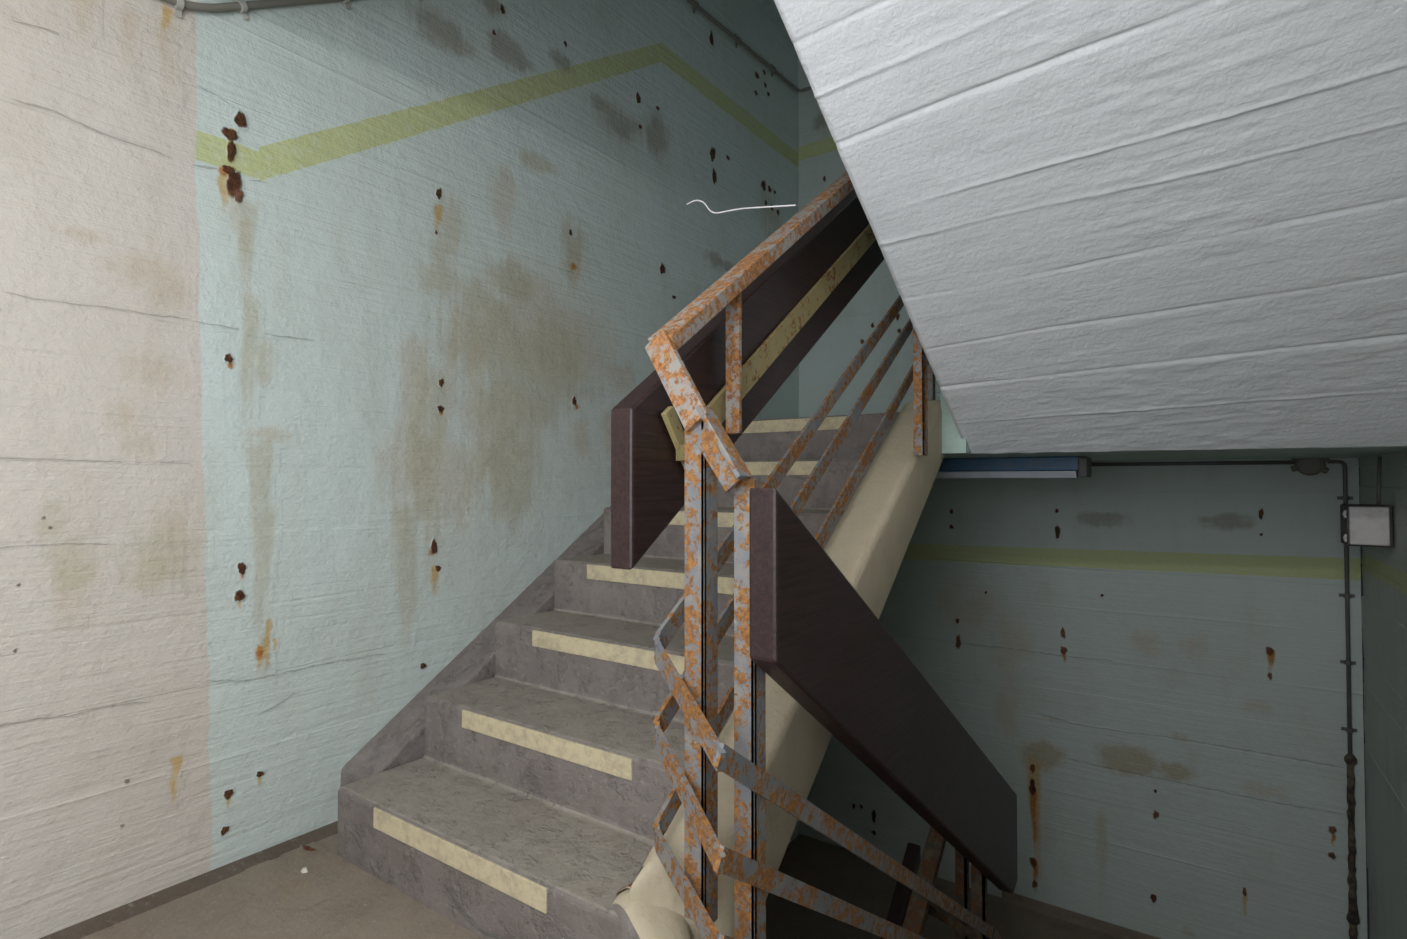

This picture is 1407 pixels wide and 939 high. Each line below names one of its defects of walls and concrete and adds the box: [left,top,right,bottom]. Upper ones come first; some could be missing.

water stain [390,0,672,173]
corrosion [214,107,264,294]
crack [6,292,311,340]
water stain [368,142,640,665]
water stain [231,289,296,694]
corrosion [428,535,442,597]
corrosion [254,617,280,672]
water stain [926,570,1212,787]
corrosion [1264,645,1278,682]
corrosion [165,753,188,811]
corrosion [1023,754,1046,895]